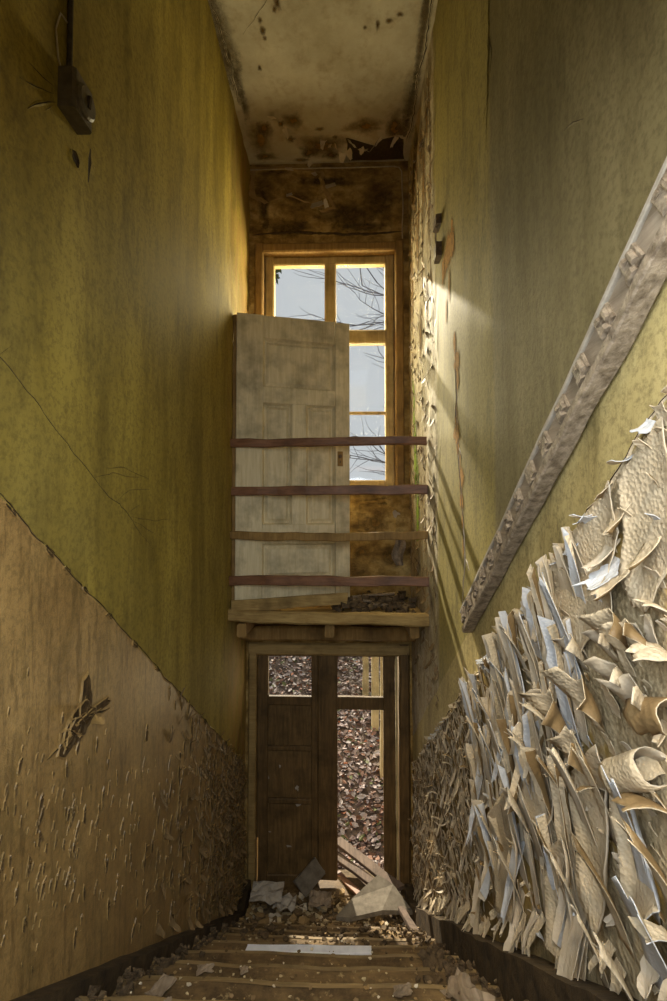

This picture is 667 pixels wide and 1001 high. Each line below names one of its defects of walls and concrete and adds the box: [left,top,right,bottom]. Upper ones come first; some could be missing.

crack [0,346,170,548]
peeling [0,670,183,934]
peeling [408,385,667,1001]